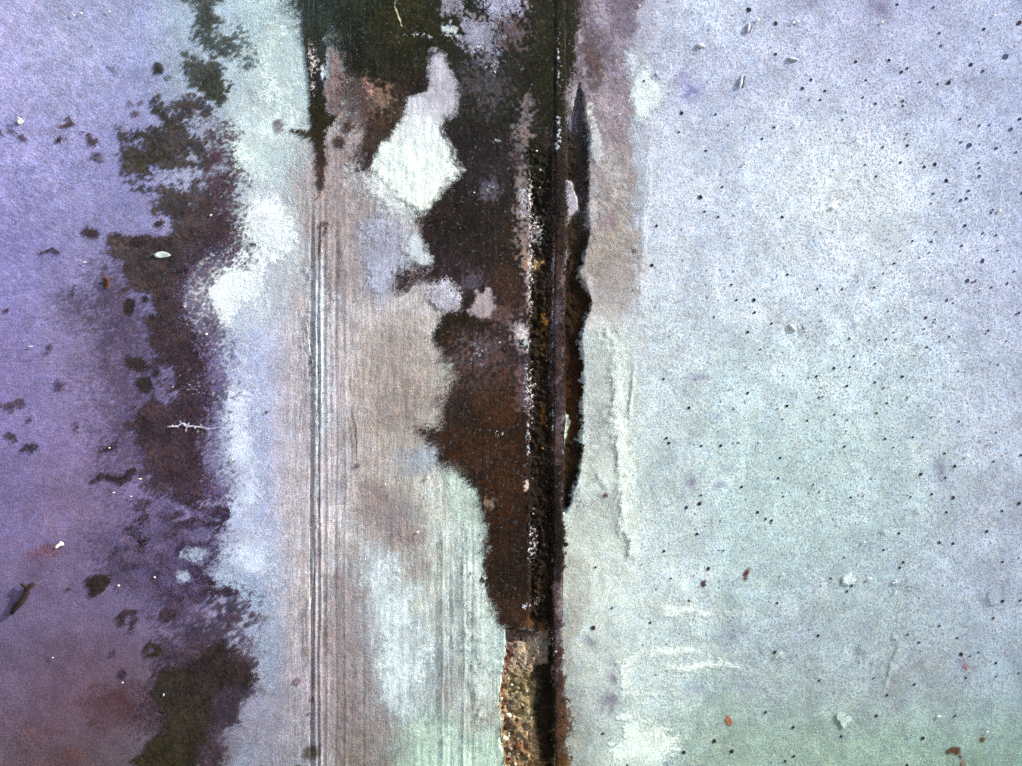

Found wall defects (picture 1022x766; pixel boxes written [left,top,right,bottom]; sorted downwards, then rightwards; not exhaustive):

leakage [46,0,268,766]
peeling [349,440,556,766]
leakage [274,0,646,766]